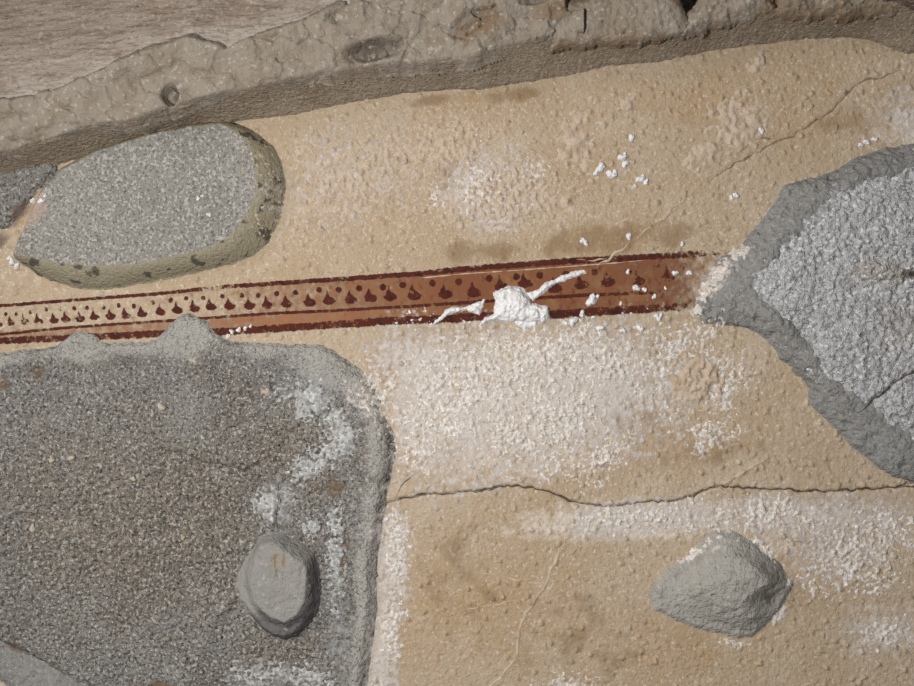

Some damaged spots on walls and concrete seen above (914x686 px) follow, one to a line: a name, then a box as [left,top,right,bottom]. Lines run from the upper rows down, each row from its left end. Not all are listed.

leakage [241,93,602,263]
crack [577,191,694,266]
crack [713,70,897,178]
crack [857,371,914,413]
leakage [219,243,772,686]
crack [388,457,914,507]
leakage [568,487,914,654]